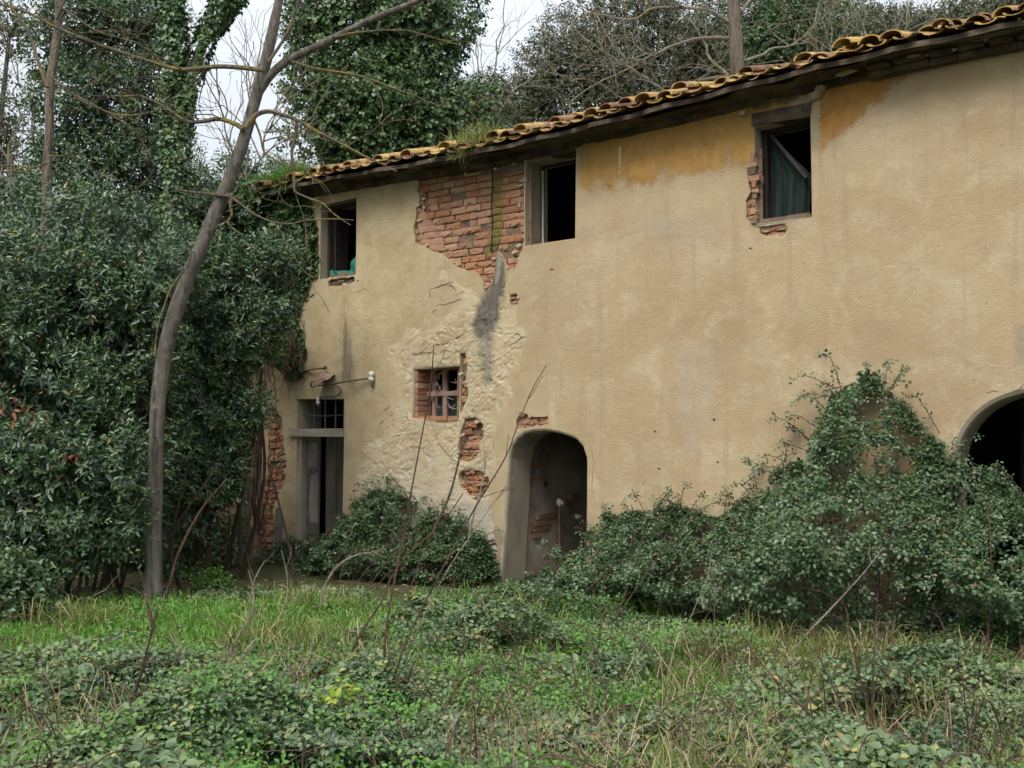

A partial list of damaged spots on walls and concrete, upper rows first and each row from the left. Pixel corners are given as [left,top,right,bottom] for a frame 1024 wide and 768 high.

leakage [576,93,808,208]
spalling [747,145,812,236]
flaking render [258,407,286,553]
peeling [349,162,532,585]
leakage [469,253,507,389]
spalling [517,412,548,438]